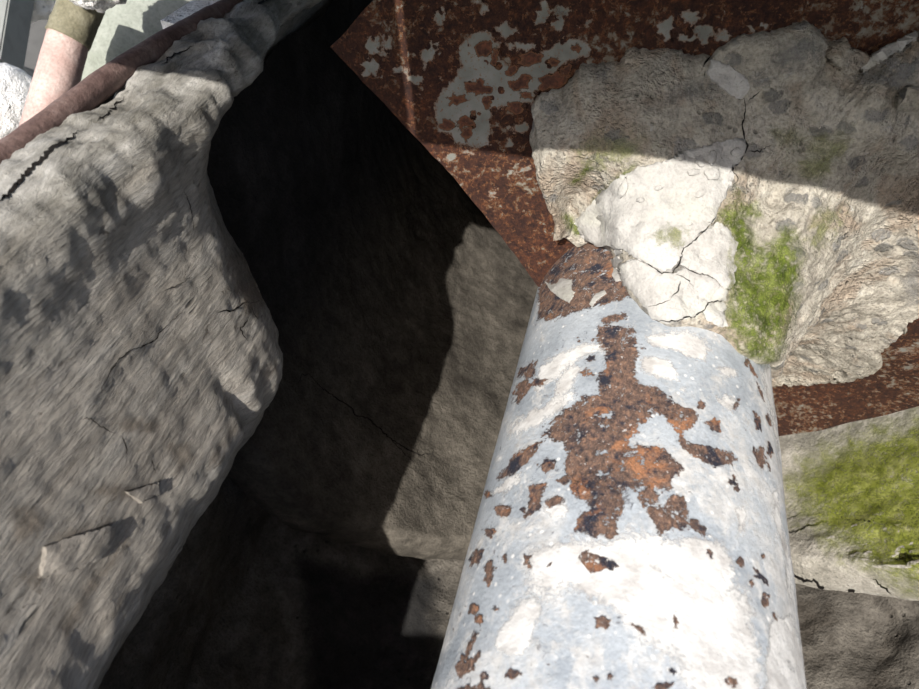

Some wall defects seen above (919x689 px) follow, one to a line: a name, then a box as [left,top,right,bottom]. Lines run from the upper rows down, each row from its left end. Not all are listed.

peeling [656,9,732,48]
spalling [825,30,918,76]
crack [0,98,124,202]
spalling [574,137,747,327]
peeling [545,278,575,303]
crack [627,215,724,323]
corrosion [483,243,740,539]
crack [787,503,917,533]
corrosion [578,549,619,573]
corrosion [736,557,778,621]
crack [794,574,824,589]
corrosion [455,603,491,689]